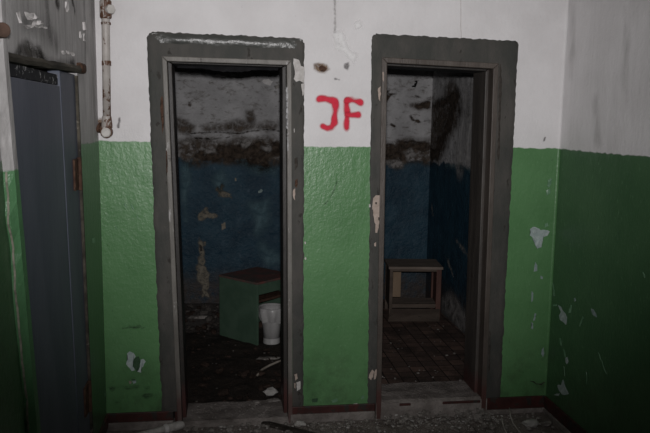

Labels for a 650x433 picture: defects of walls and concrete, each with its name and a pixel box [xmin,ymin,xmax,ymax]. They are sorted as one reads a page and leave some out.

peeling [293,59,304,95]
damp [205,112,276,133]
peeling [369,195,380,233]
peeling [530,223,550,249]
peeling [196,241,209,297]
peeling [126,351,146,373]